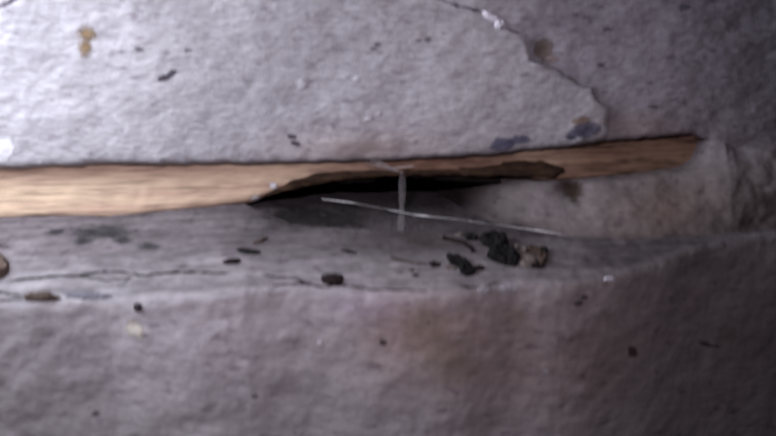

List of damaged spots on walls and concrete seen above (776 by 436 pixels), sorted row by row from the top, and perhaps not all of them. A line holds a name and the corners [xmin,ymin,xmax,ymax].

rust [80,29,96,56]
spalling [0,136,14,163]
spalling [563,182,580,202]
crack [0,270,227,301]